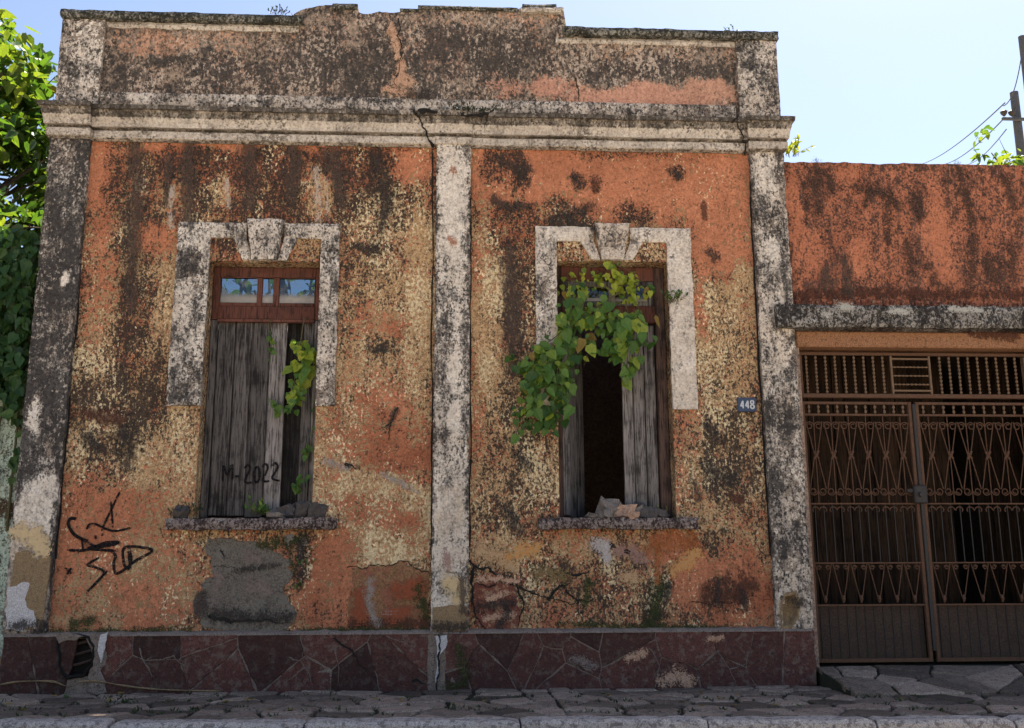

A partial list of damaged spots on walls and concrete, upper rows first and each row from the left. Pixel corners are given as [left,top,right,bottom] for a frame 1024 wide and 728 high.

damp [122,142,147,315]
damp [163,143,200,222]
damp [490,193,538,214]
damp [543,173,601,227]
damp [791,158,1024,302]
crack [411,109,434,578]
crack [466,165,474,559]
flaking render [5,519,108,695]
peeling [347,548,584,634]
crack [552,568,594,602]
crack [333,637,367,682]
crack [387,634,441,691]